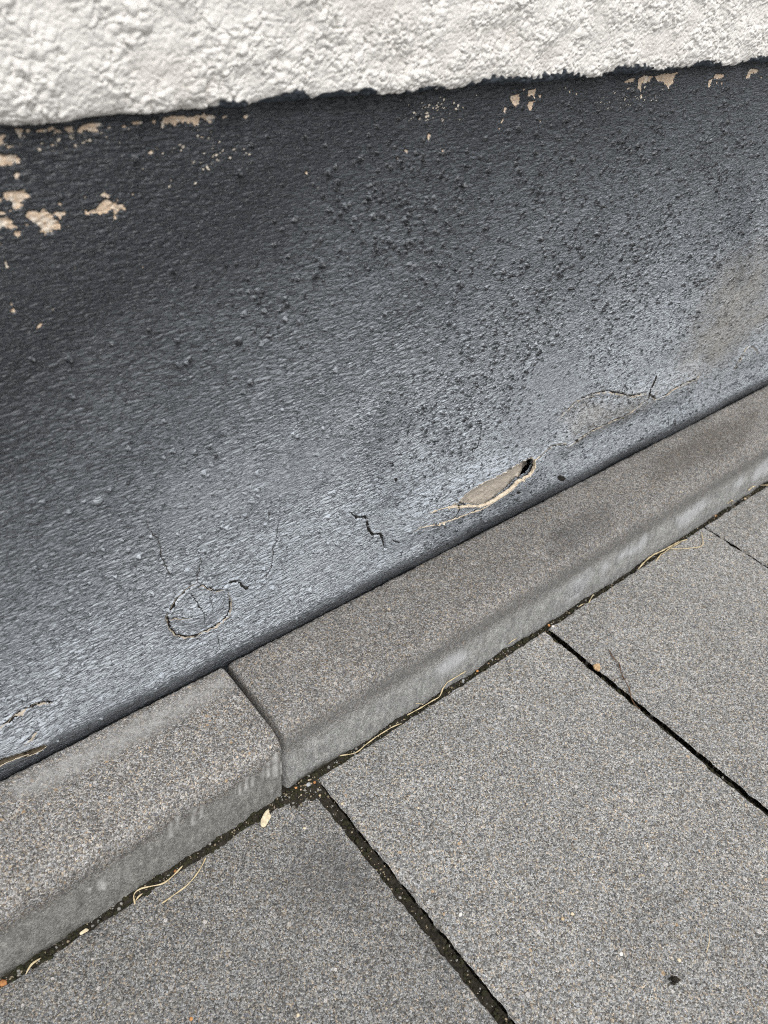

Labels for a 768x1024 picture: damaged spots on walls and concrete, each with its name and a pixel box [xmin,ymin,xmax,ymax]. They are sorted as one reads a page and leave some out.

peeling [498,89,541,130]
peeling [613,72,678,106]
peeling [0,113,251,237]
crack [349,512,399,548]
spalling [412,457,539,534]
crack [146,514,279,649]